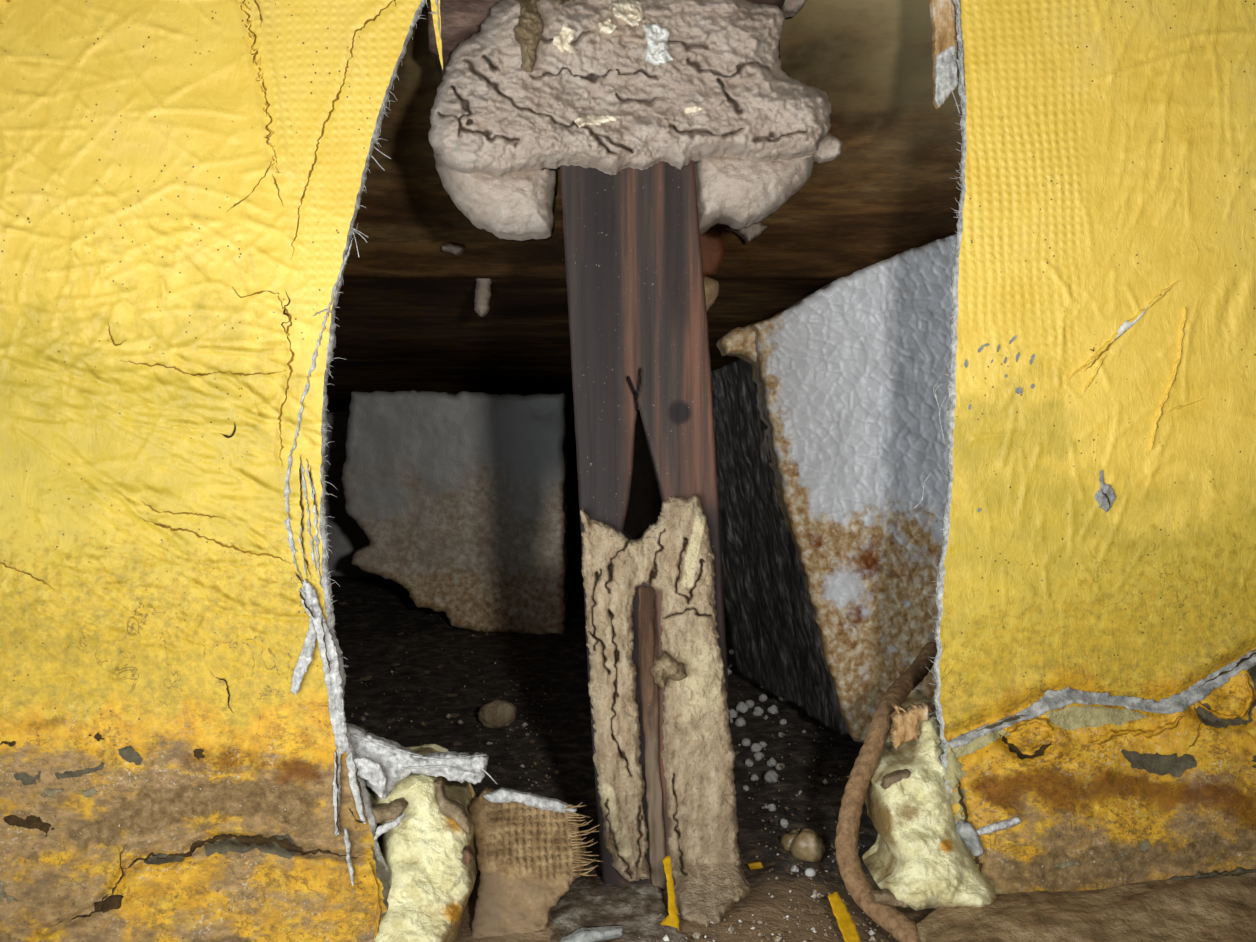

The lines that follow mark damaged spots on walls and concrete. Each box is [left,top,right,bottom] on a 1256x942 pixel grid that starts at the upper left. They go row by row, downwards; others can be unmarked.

crack [291,0,394,258]
crack [108,287,294,462]
spalling [716,324,757,364]
crack [941,649,1256,823]
peeling [880,769,911,789]
peeling [3,815,54,837]
peeling [433,777,475,865]
crack [41,834,368,933]
peeling [661,855,680,932]
peeling [872,889,909,908]
crack [974,856,998,897]